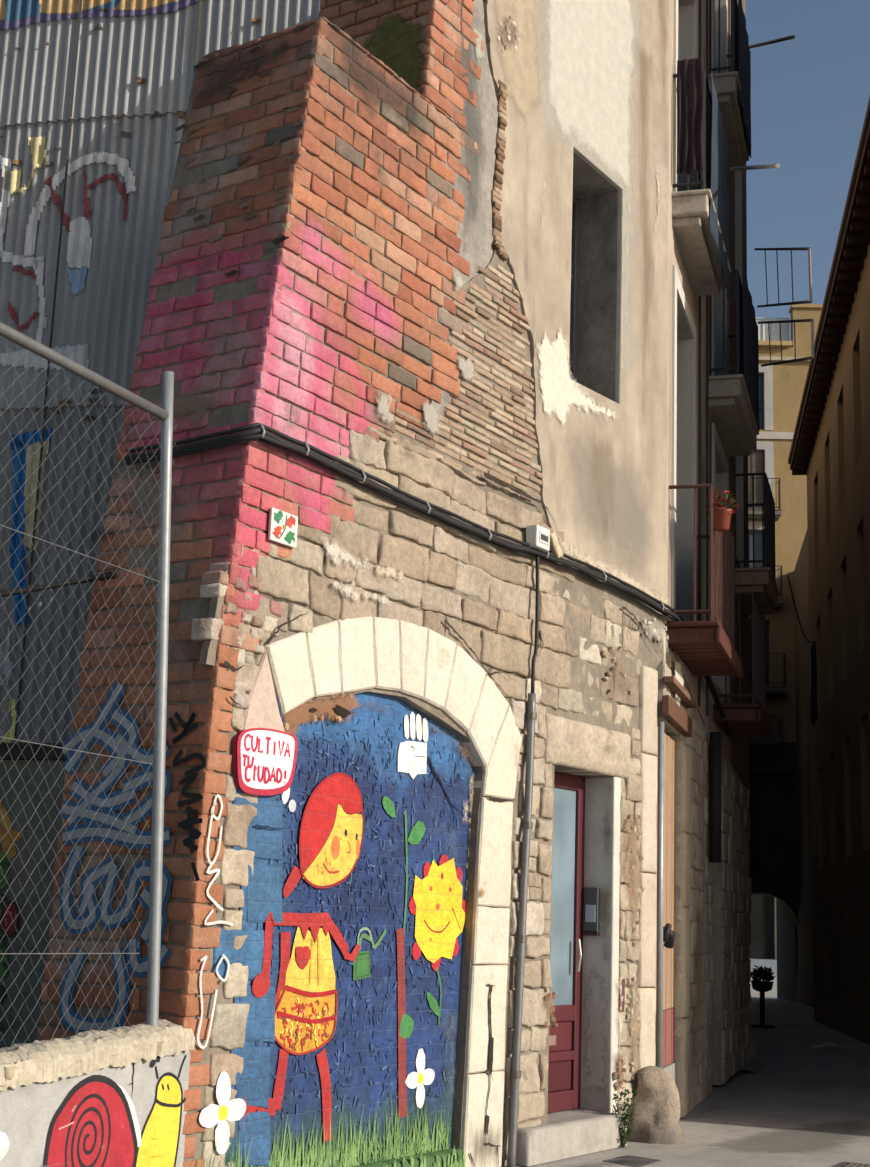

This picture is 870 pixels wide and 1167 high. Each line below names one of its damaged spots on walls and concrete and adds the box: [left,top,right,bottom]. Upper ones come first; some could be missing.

flaking render [376,79,550,502]
crack [488,984,496,1037]
crack [470,1073,503,1167]